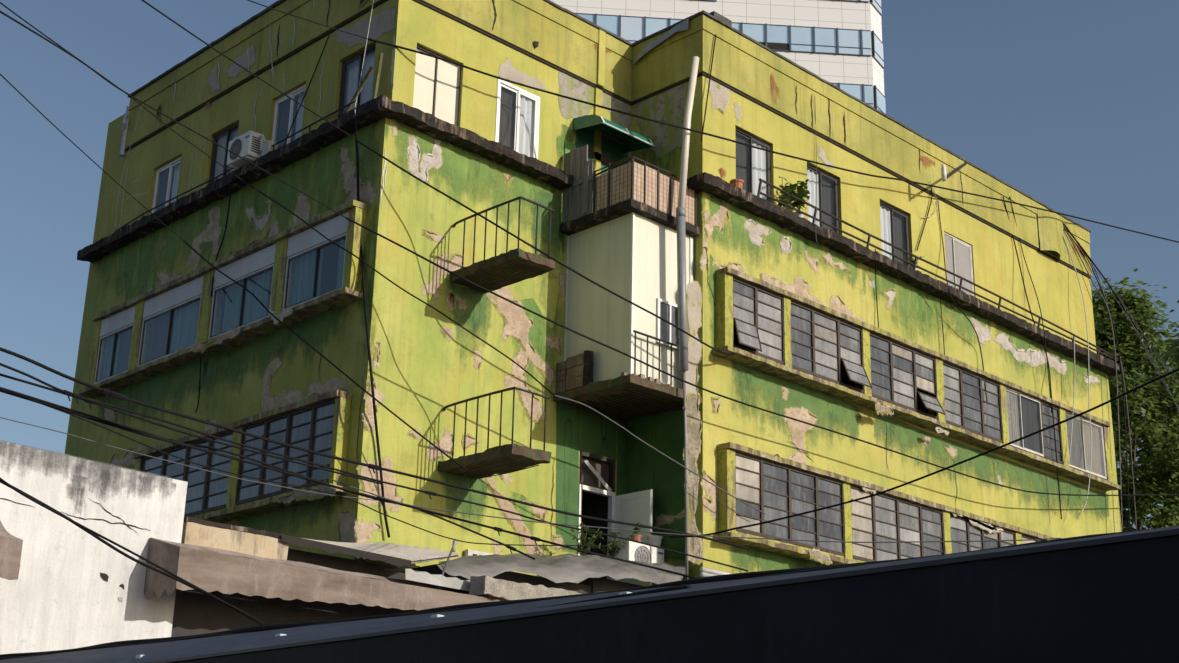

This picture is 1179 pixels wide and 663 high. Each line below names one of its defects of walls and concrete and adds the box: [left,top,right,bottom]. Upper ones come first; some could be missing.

peeling [333,0,396,48]
peeling [498,58,689,157]
peeling [392,125,443,181]
peeling [147,207,221,292]
peeling [744,219,865,322]
peeling [487,286,562,423]
spalling [655,203,745,565]
peeling [970,318,1067,375]
peeling [781,386,818,464]
leakage [0,440,176,506]
crack [0,498,148,534]
spalling [810,548,832,565]